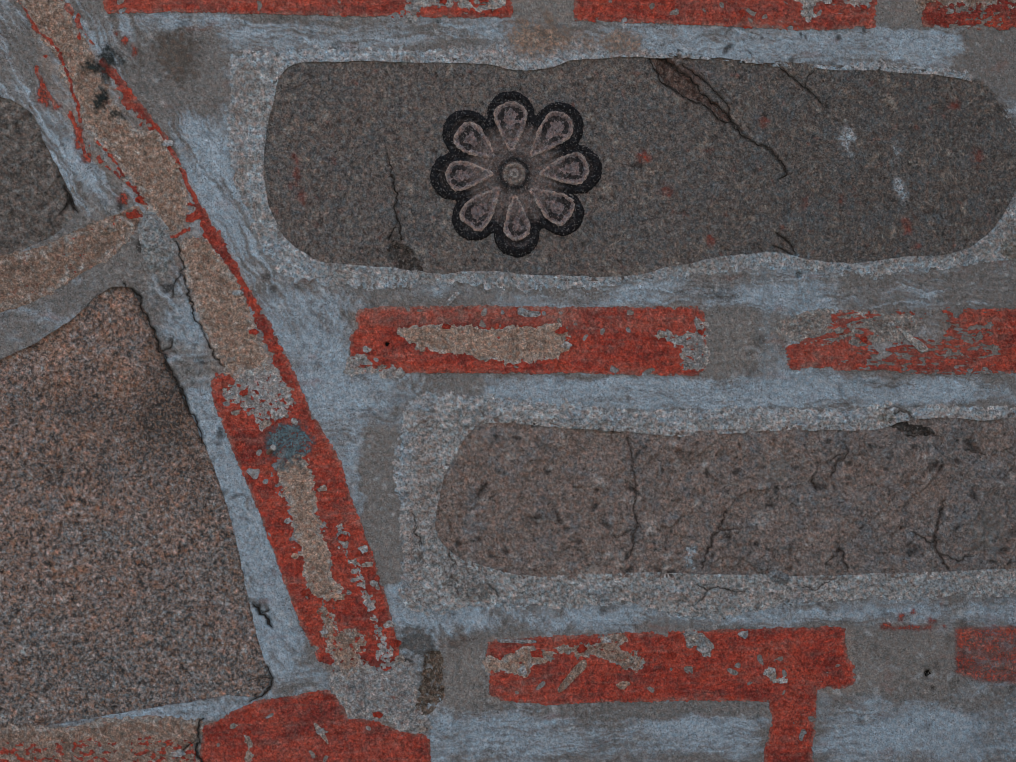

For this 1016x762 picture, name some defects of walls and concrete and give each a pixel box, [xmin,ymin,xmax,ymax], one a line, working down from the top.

peeling [794,0,872,22]
crack [649,41,787,178]
crack [780,68,822,104]
peeling [397,307,572,366]
peeling [654,316,711,371]
peeling [775,308,928,352]
crack [888,406,936,437]
crack [617,441,639,559]
crack [693,511,745,606]
crack [909,500,976,569]
peeling [277,454,445,735]
peeling [482,632,646,692]